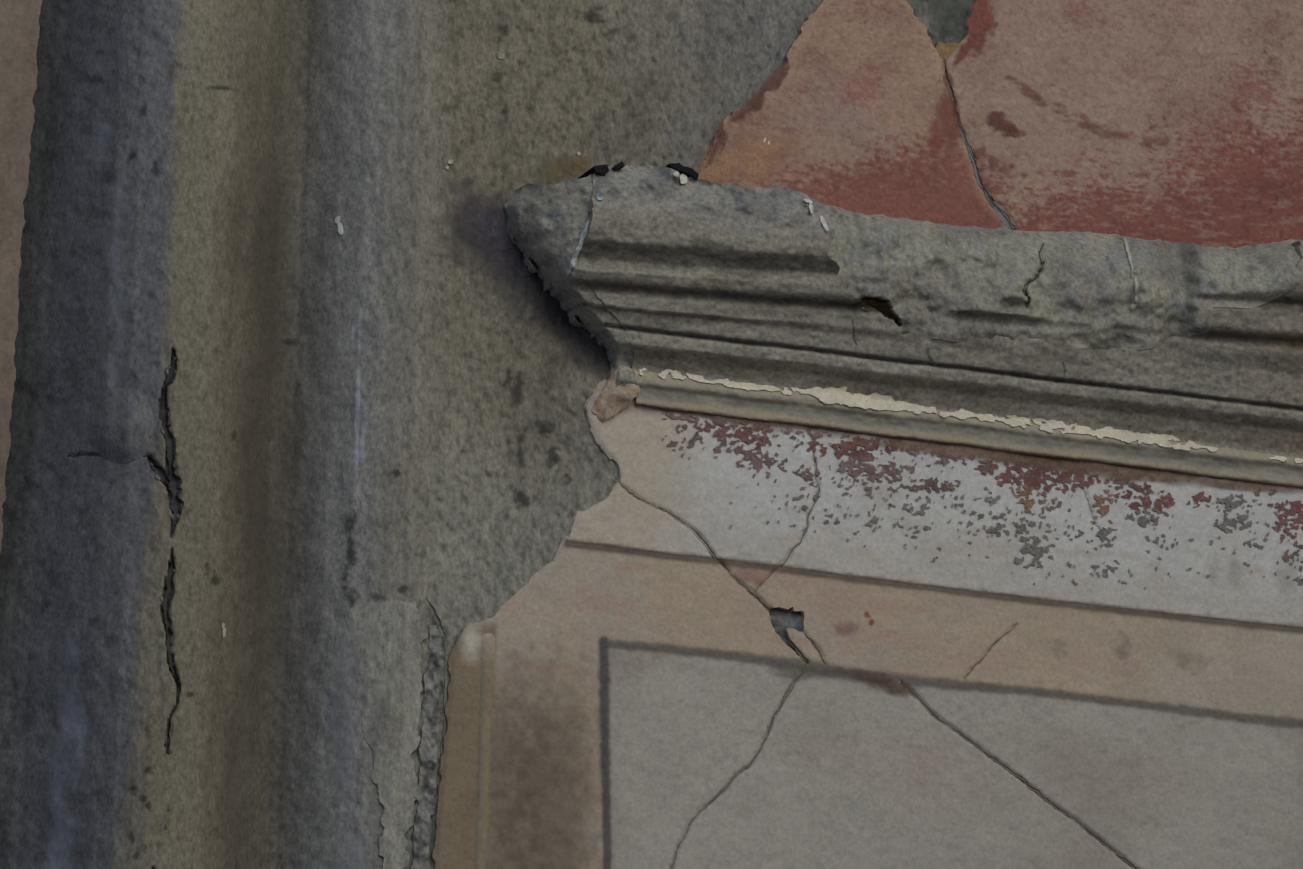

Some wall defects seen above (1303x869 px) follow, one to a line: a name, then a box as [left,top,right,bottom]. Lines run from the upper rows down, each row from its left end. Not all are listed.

crack [934,41,1016,230]
peeling [955,0,998,64]
peeling [988,111,1020,137]
spalling [503,174,1218,452]
crack [1025,246,1043,306]
spalling [827,205,1303,350]
crack [143,349,184,753]
crack [616,453,820,611]
peeling [662,411,1303,585]
peeling [344,518,445,869]
crack [671,633,825,869]
crack [901,683,1137,869]